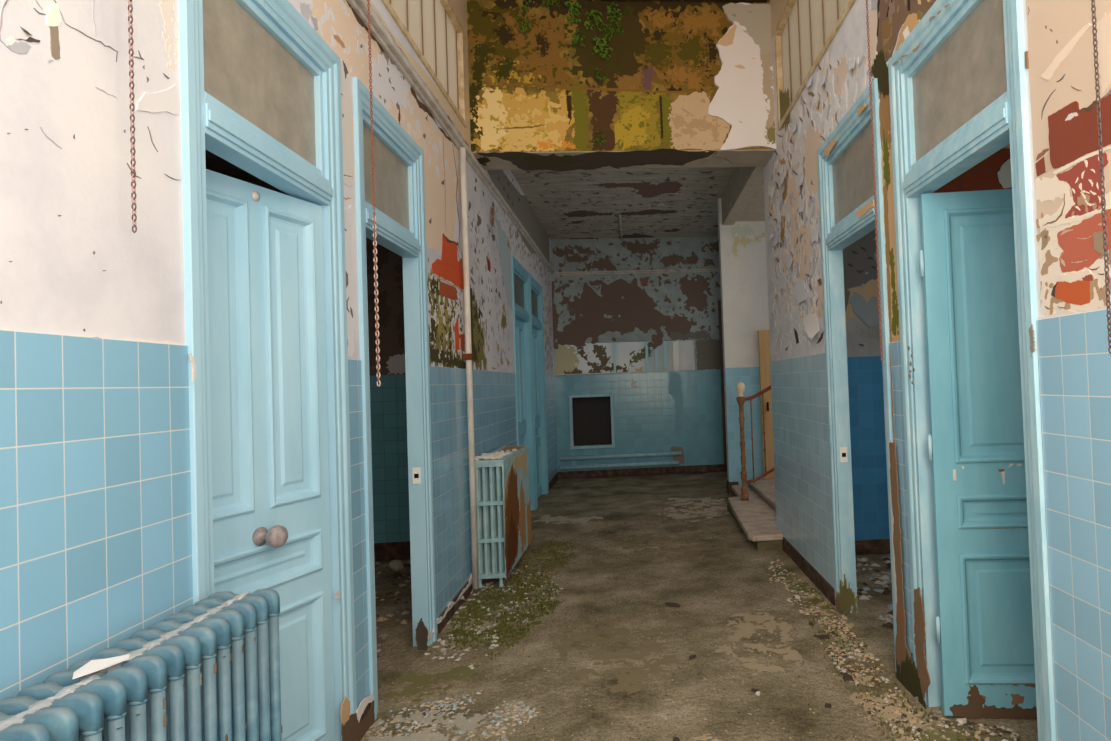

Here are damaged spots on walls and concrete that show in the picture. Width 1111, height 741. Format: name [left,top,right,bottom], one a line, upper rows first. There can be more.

crack [0,0,170,79]
damp [470,0,752,152]
crack [127,126,177,180]
flaking render [288,0,878,375]
peeling [843,143,915,384]
flaking render [1024,0,1111,357]
peeling [888,439,897,625]
flaking render [341,693,375,741]
peeling [979,684,1036,705]